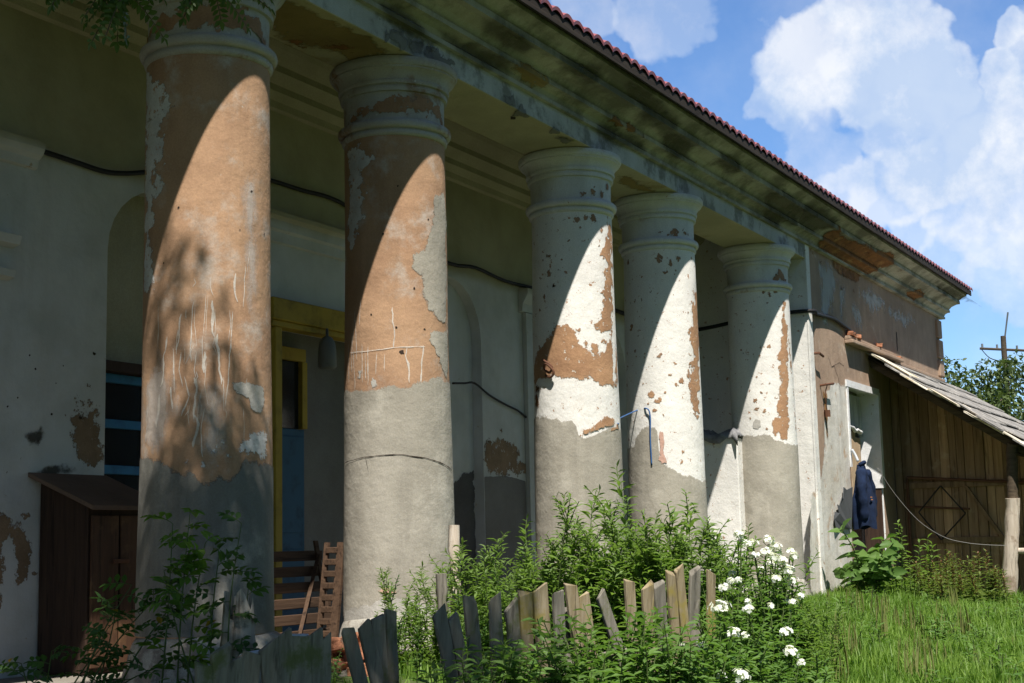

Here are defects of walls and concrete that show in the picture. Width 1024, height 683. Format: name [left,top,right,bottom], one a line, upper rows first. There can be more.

damp [273,1,386,60]
damp [445,25,549,88]
damp [631,87,691,158]
peeling [144,73,175,293]
peeling [534,214,618,388]
flaking render [810,226,906,340]
peeling [643,292,700,419]
peeling [741,269,796,440]
flaking render [51,383,104,468]
crack [344,454,450,468]
peeling [580,416,619,437]
flaking render [0,512,38,609]